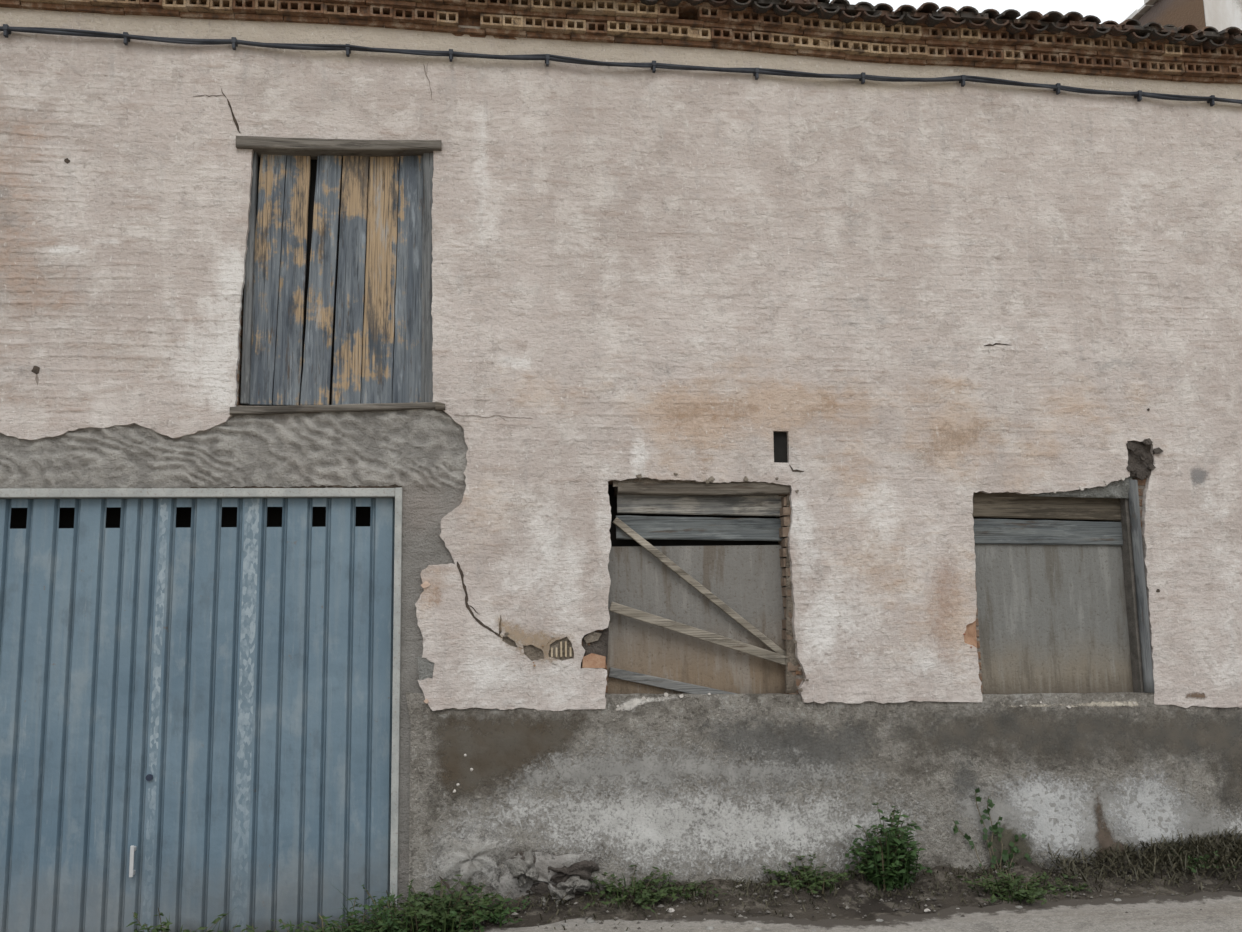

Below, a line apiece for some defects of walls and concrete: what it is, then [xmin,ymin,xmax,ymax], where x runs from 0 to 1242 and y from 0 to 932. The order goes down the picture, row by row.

crack [193,88,240,133]
crack [457,562,557,649]
flaking render [417,657,435,680]
flaking render [502,626,609,668]
flaking render [616,693,683,711]
leakage [428,713,925,892]